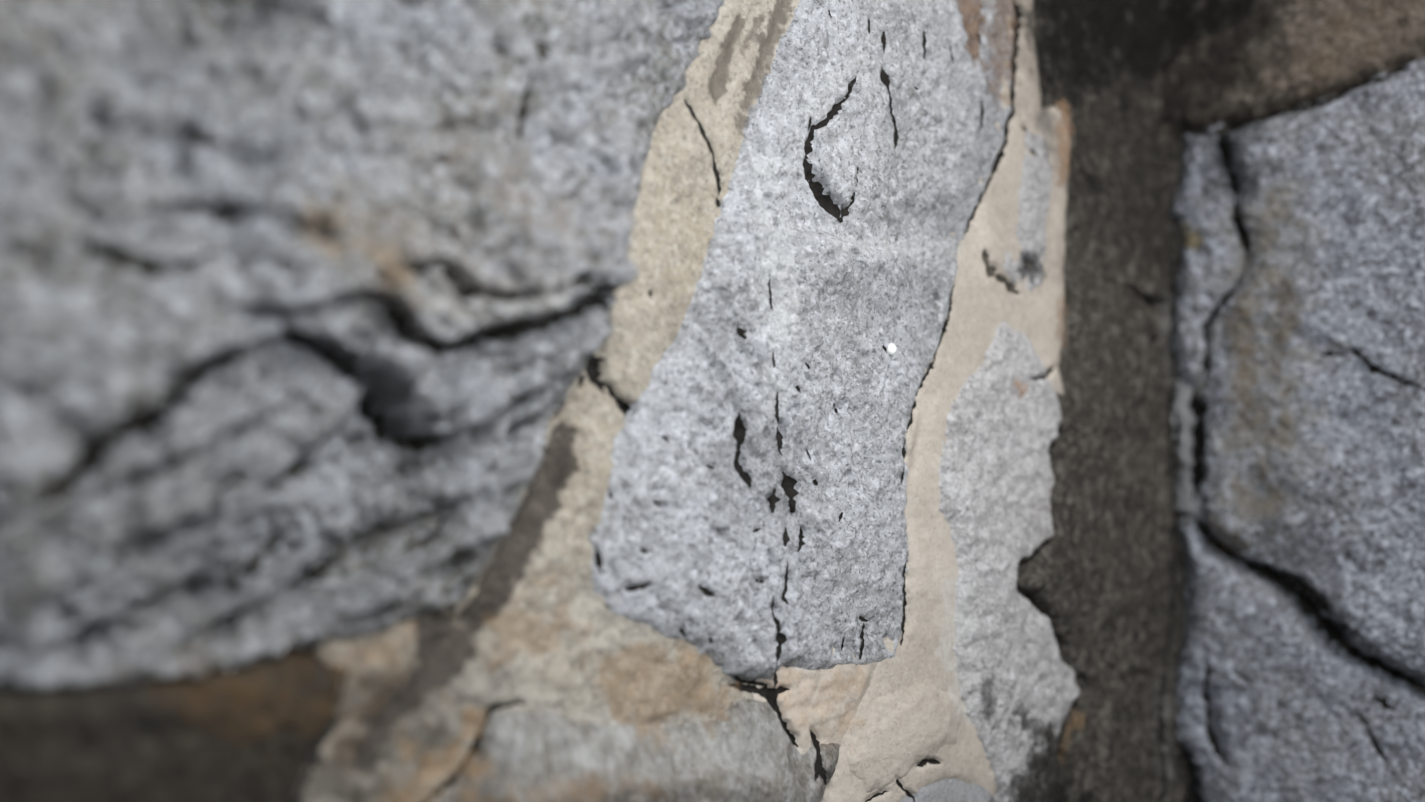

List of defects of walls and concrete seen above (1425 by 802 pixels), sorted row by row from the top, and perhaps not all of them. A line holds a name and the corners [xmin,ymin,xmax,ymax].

crack [921,30,929,60]
crack [179,132,224,147]
crack [803,19,899,223]
crack [1186,68,1407,255]
crack [75,198,243,278]
crack [386,264,653,354]
crack [766,274,774,312]
crack [35,320,441,508]
crack [578,355,631,419]
crack [729,352,827,785]
crack [1156,289,1425,802]